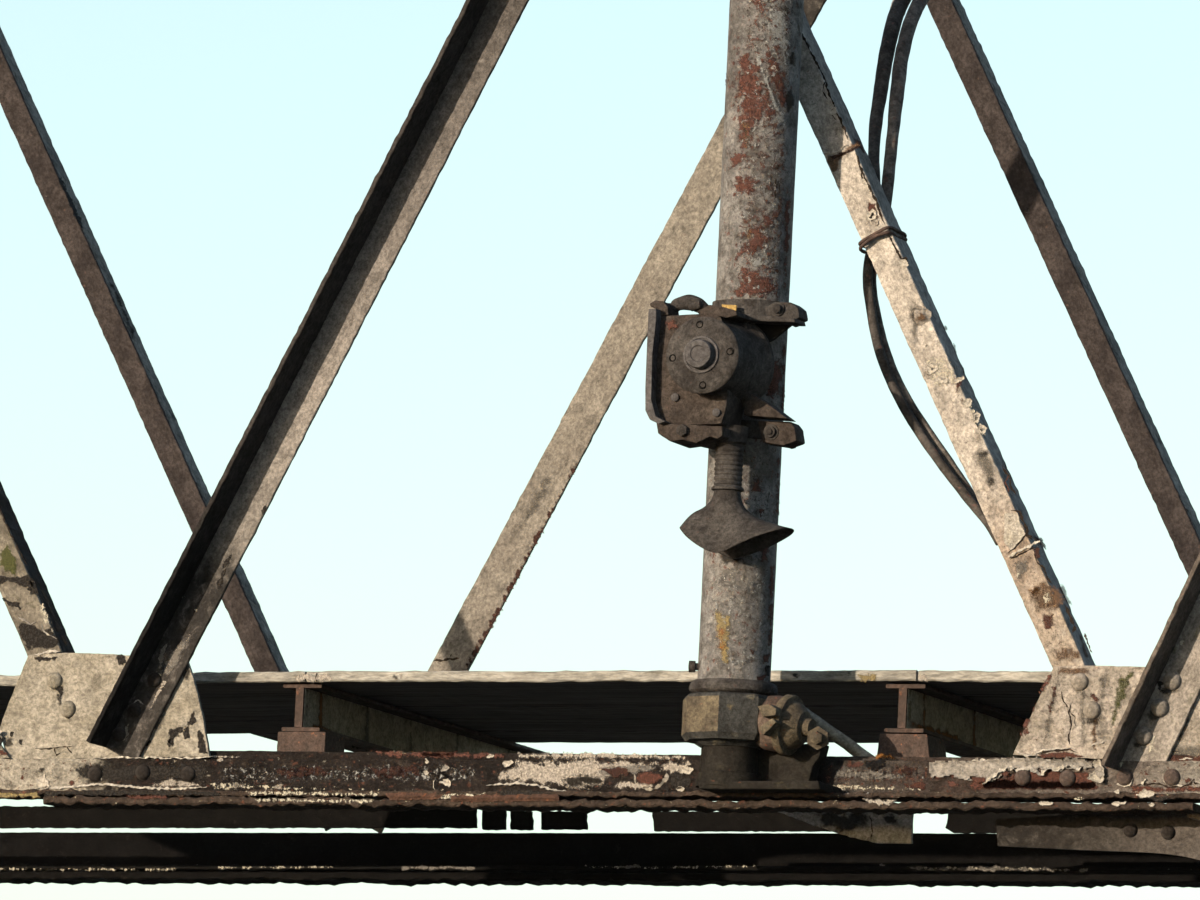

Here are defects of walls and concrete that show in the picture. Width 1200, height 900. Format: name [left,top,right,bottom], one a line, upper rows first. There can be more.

rust [725,0,796,298]
rust [744,457,780,517]
crack [1002,464,1037,553]
peeling [18,603,59,656]
rust [710,549,776,681]
crack [1061,691,1076,744]
peeling [35,752,694,804]
rust [846,753,986,790]
peeling [825,741,1200,807]